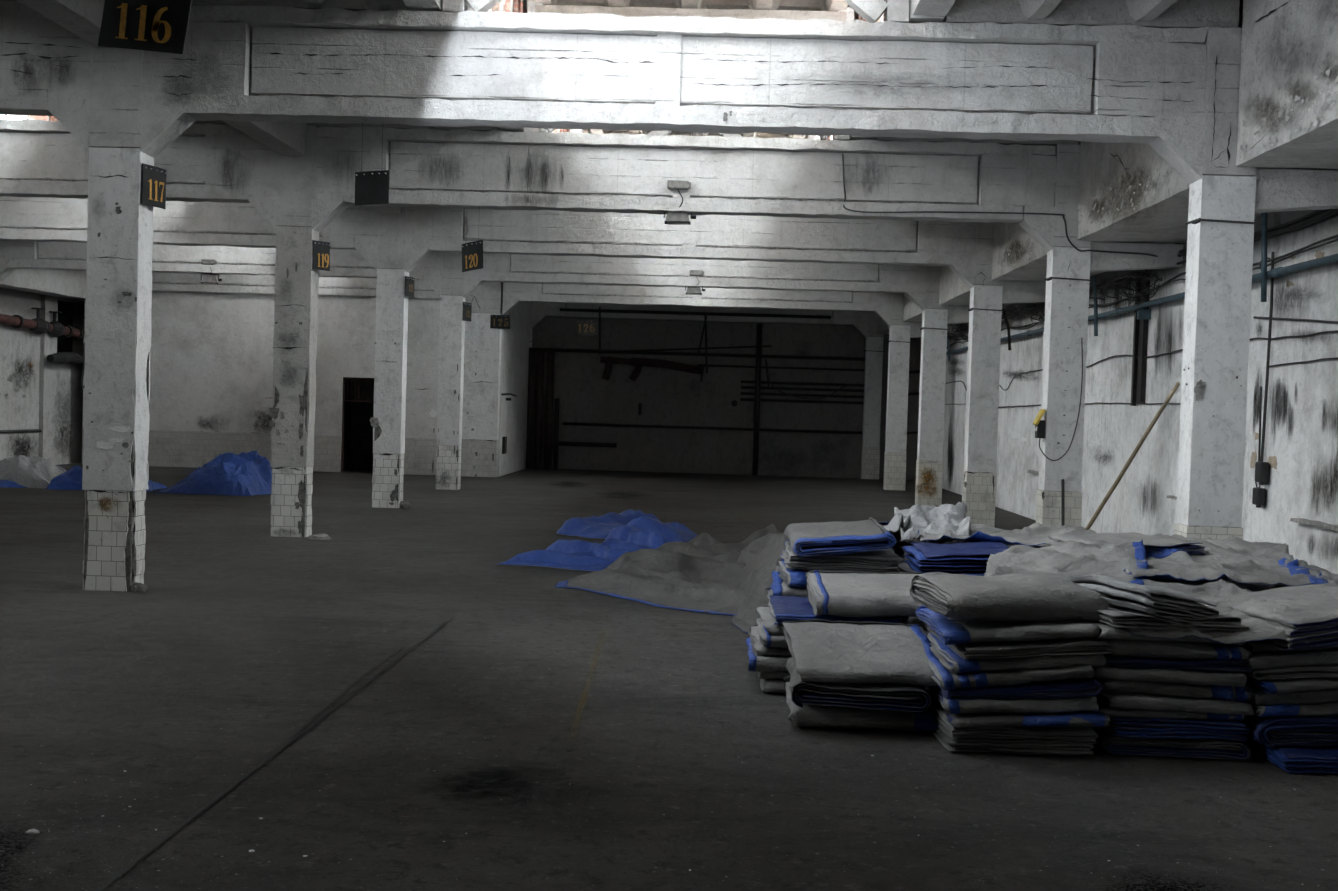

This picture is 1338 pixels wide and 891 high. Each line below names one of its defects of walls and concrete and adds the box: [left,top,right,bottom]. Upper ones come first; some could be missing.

leakage [1253,377,1297,433]
leakage [1322,405,1338,431]
leakage [1313,452,1338,510]